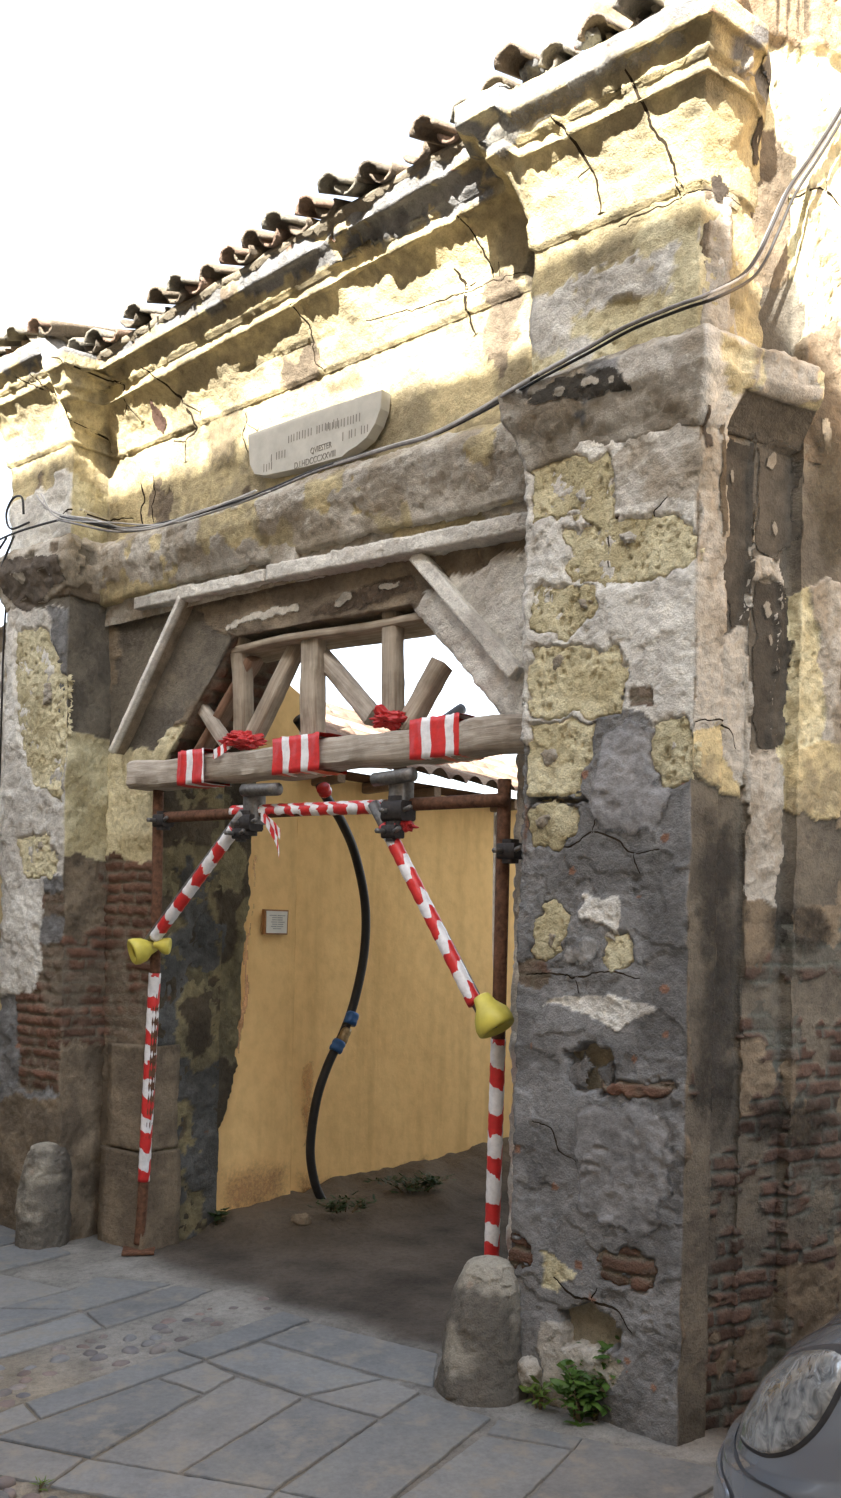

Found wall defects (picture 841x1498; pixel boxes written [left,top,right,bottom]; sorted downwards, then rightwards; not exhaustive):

crack [548,62,743,233]
crack [366,211,525,337]
peeling [528,366,632,404]
peeling [702,404,804,752]
spalling [0,554,75,802]
spalling [526,452,705,851]
spalling [17,833,59,880]
spalling [531,899,571,961]
spalling [602,931,634,973]